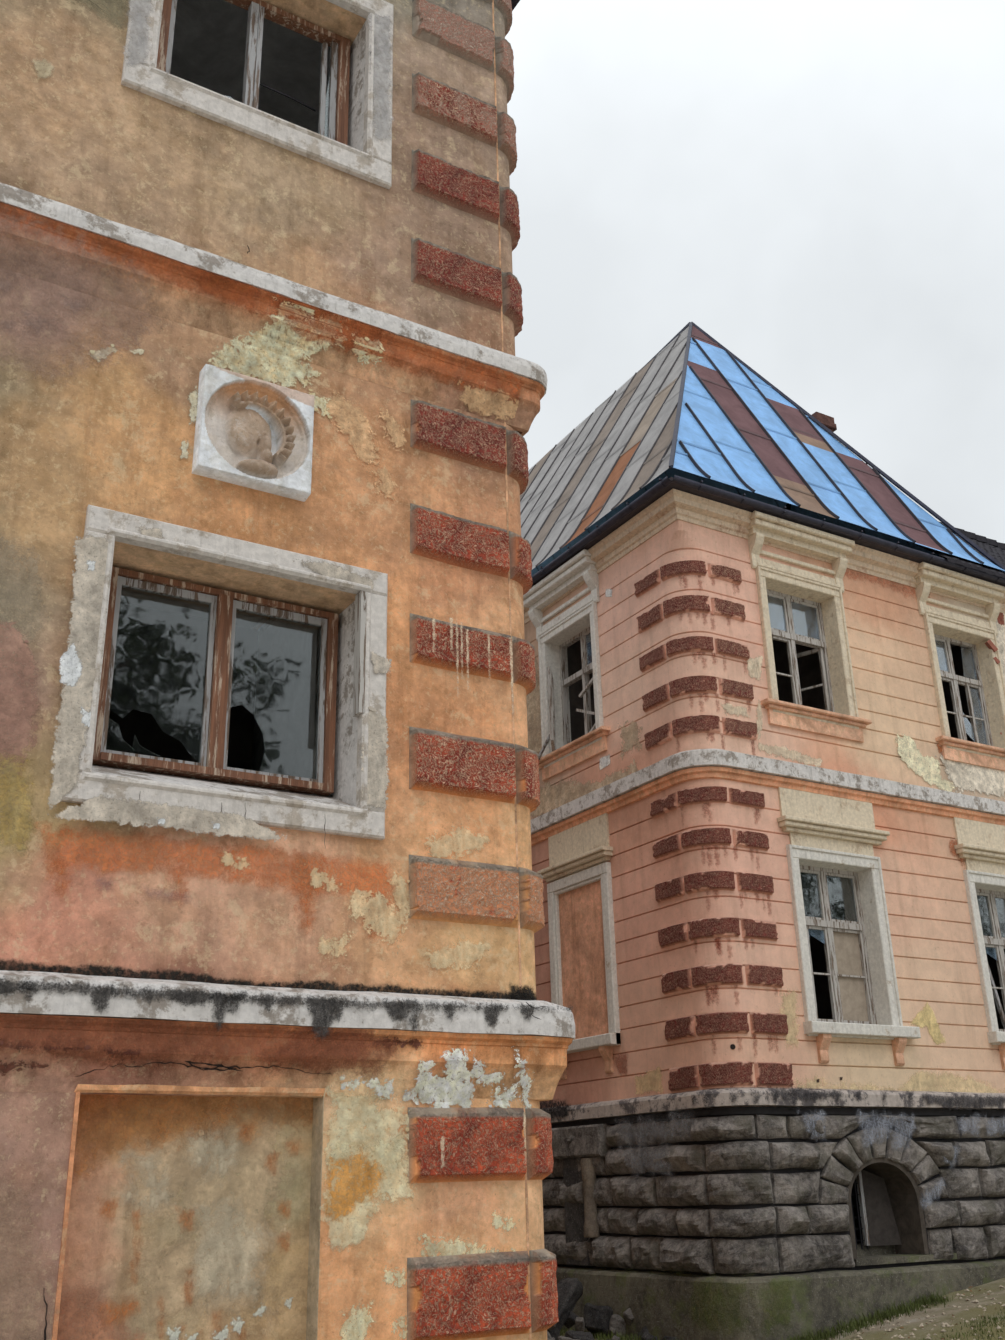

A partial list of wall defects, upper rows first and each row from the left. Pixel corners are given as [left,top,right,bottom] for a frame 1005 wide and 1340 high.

peeling [124,0,153,65]
peeling [208,296,407,500]
peeling [457,379,520,425]
peeling [986,612,1005,680]
peeling [895,734,1005,799]
leakage [0,959,572,1074]
peeling [0,1038,91,1076]
peeling [321,1036,535,1249]
peeling [418,1210,519,1257]
crack [42,1297,50,1340]
leakage [57,1288,138,1340]
peeling [340,1302,375,1340]